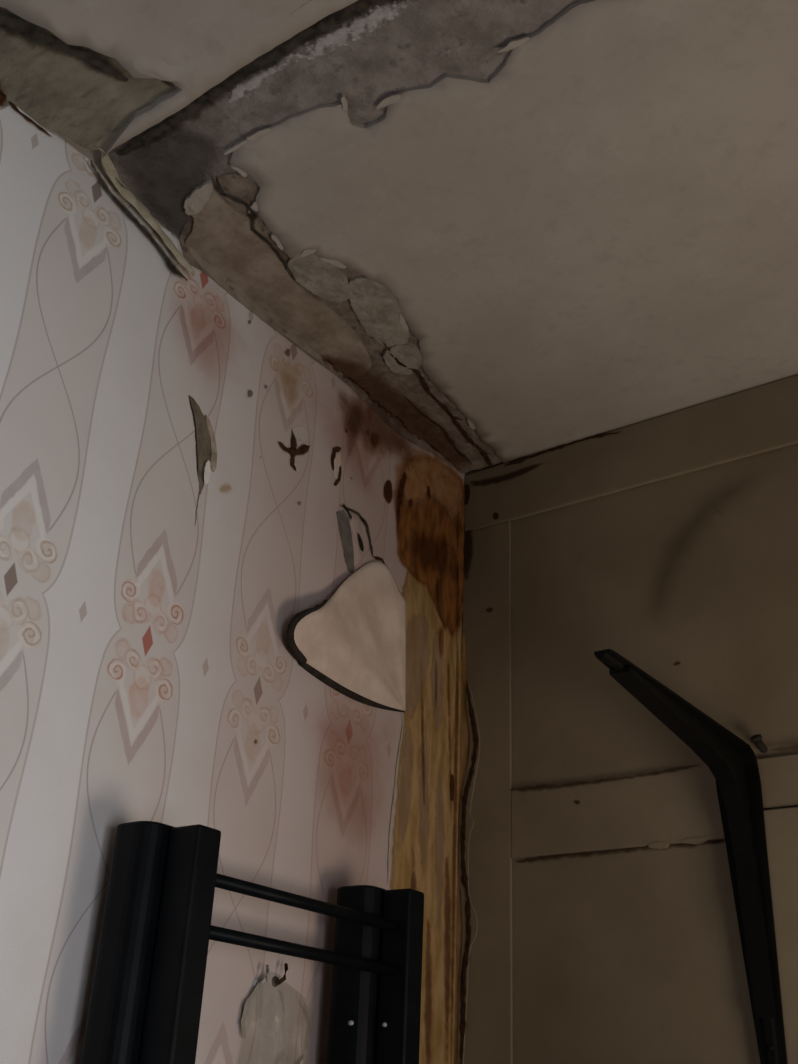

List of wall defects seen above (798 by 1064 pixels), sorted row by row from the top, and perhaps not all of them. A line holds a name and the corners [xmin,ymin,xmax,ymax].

flaking render [0,0,580,504]
peeling [286,561,406,712]
crack [513,764,700,790]
crack [516,840,725,862]